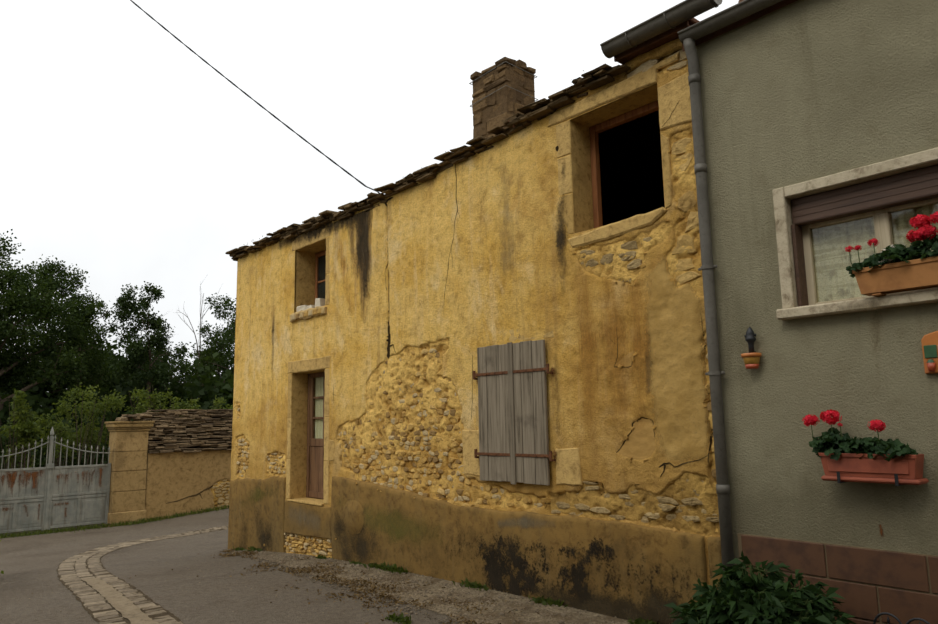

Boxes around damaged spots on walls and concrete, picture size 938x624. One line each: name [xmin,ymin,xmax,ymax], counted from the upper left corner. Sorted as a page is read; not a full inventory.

damp [279,210,370,304]
damp [556,194,565,265]
flaking render [572,220,676,286]
crack [385,264,396,359]
rust [1,470,43,489]
flaking render [235,435,250,479]
flaking render [337,333,720,536]
crack [616,417,655,453]
crack [659,429,713,478]
damp [471,535,691,624]